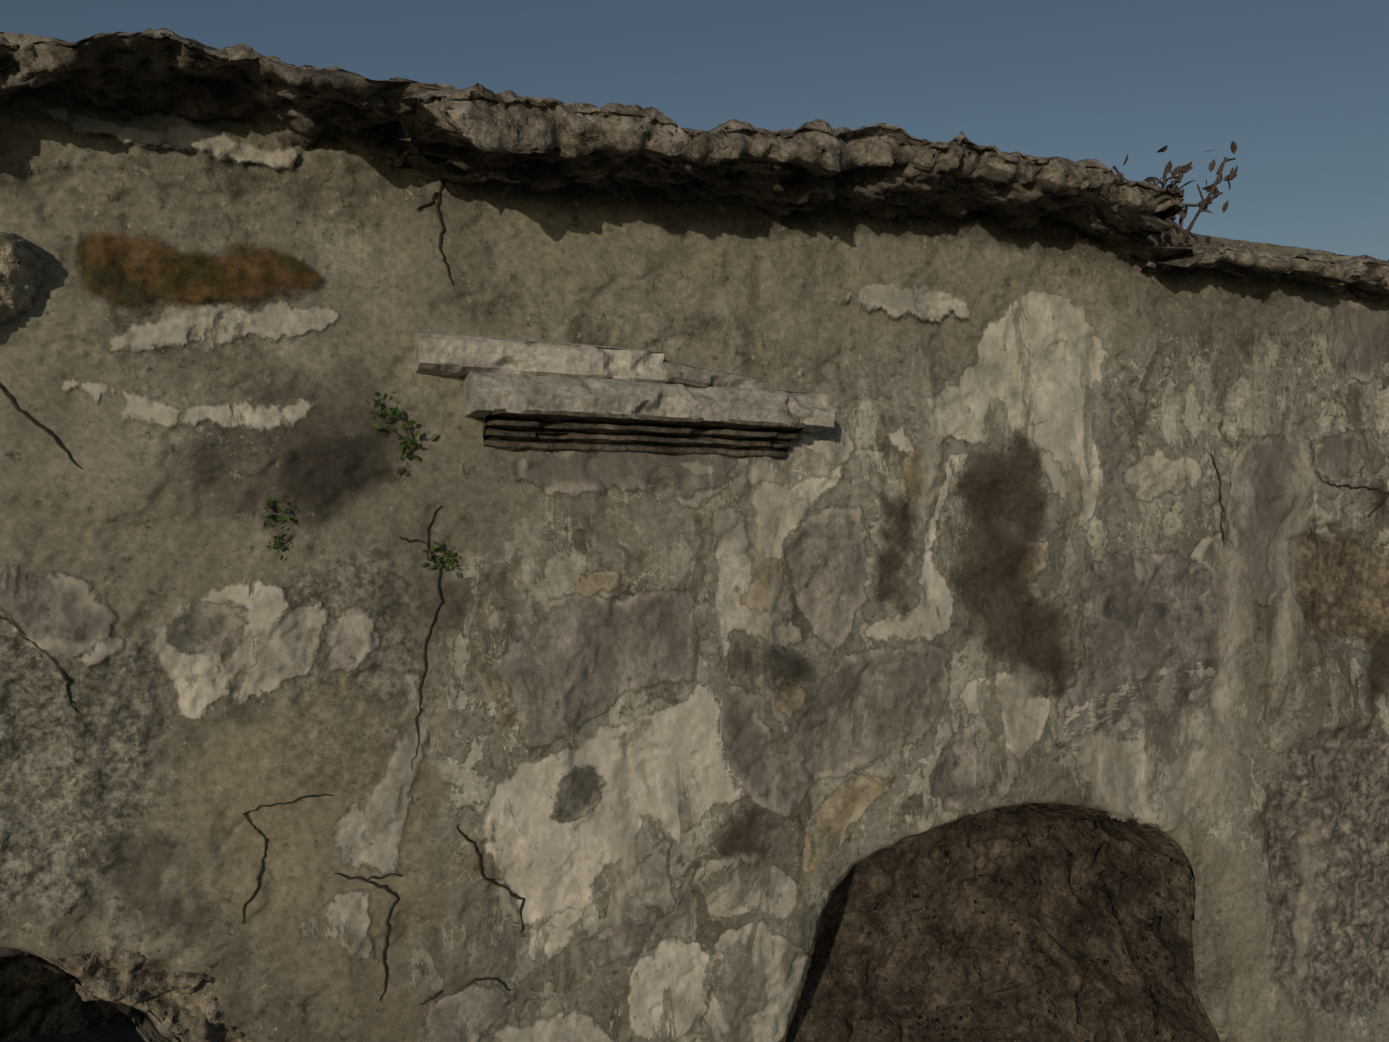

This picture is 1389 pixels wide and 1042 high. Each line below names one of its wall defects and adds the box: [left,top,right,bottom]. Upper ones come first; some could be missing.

flaking render [110,298,339,352]
crack [0,384,82,469]
flaking render [61,379,313,431]
crack [0,617,79,713]
flaking render [151,577,380,720]
damp [877,441,941,615]
flaking render [478,289,1389,1042]
damp [957,435,1072,759]
damp [1196,548,1248,819]
damp [1267,441,1315,717]
crack [241,794,333,924]
spalling [54,946,255,1042]